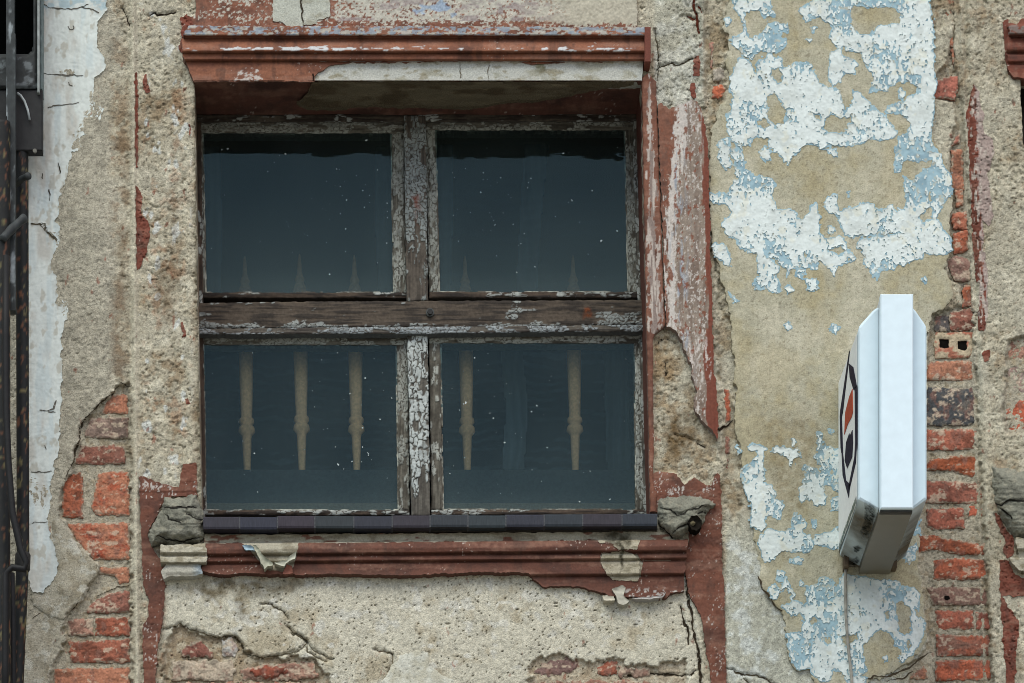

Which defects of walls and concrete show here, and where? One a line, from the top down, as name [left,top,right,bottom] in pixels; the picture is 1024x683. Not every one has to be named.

peeling [178,14,193,53]
peeling [134,72,150,168]
peeling [135,186,150,270]
peeling [28,0,131,683]
peeling [655,0,1024,683]
crack [167,603,333,662]
spalling [534,656,651,683]
crack [627,581,702,683]